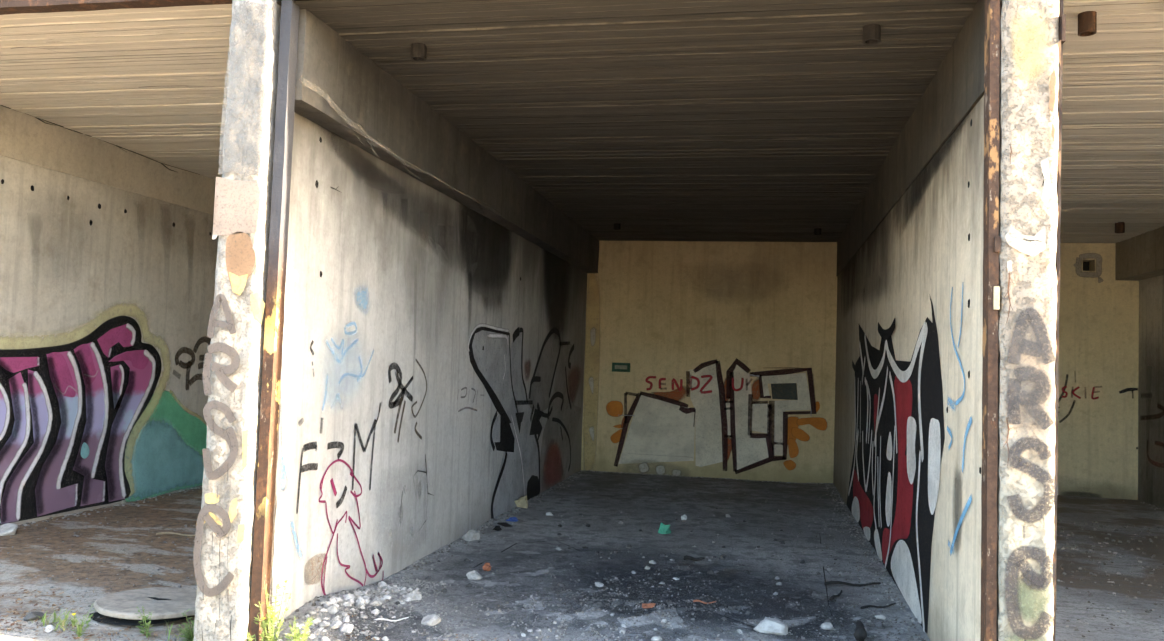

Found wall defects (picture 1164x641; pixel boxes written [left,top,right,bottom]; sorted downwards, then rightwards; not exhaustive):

peeling [212,177,265,325]
peeling [282,252,301,491]
peeling [204,493,245,543]